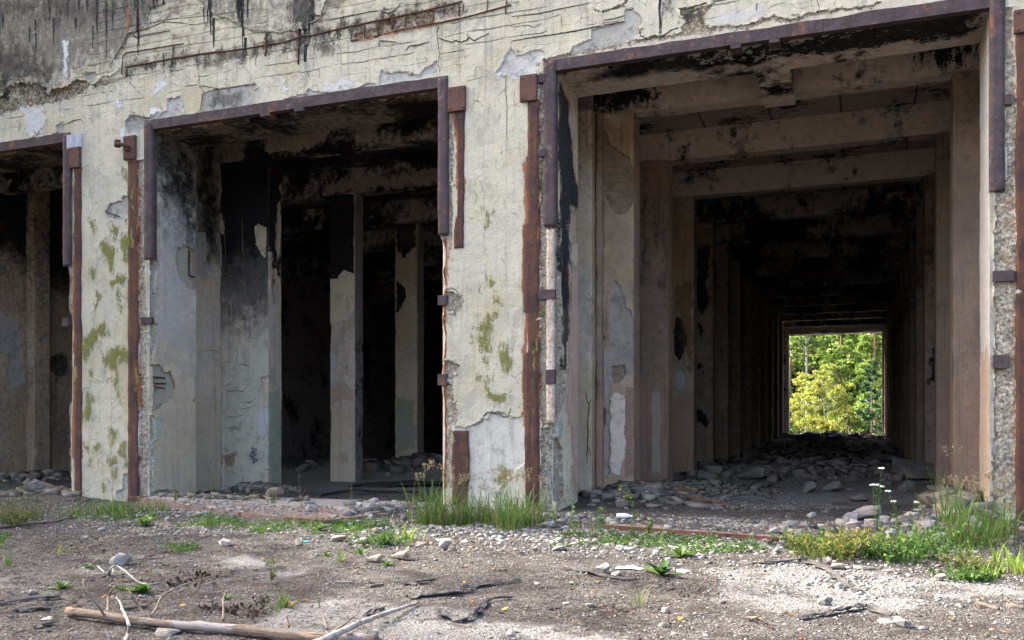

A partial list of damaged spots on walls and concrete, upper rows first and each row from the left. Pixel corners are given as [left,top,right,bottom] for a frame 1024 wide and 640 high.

crack [111,9,251,62]
crack [186,69,256,113]
water stain [0,0,455,137]
flaking render [0,0,521,116]
crack [310,3,400,24]
water stain [79,218,131,377]
spalling [105,159,176,501]
flaking render [441,112,525,508]
water stain [470,273,510,407]
rust [521,162,542,428]
flaking render [495,0,882,508]
rust [71,370,83,459]